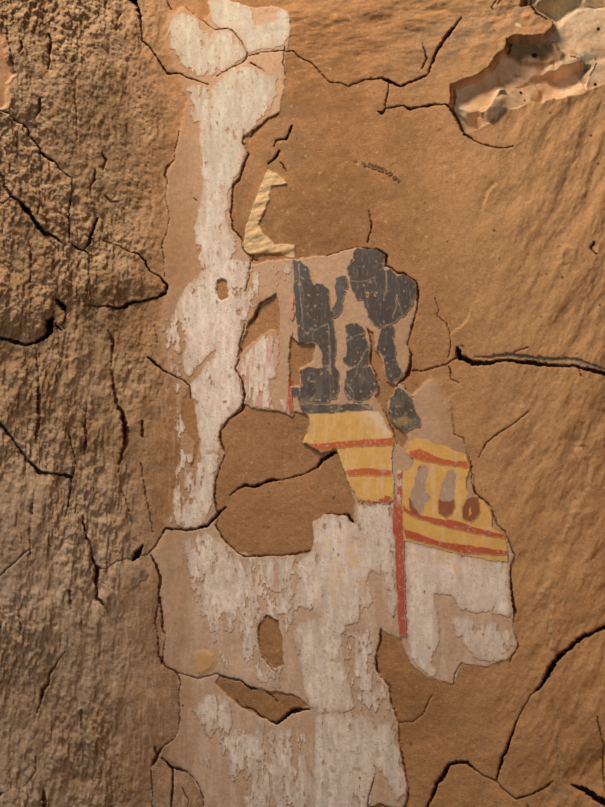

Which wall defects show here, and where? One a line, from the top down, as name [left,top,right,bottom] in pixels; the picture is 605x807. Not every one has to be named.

crack [6,28,23,74]
crack [46,32,54,70]
crack [72,76,80,140]
crack [104,0,514,149]
crack [327,211,605,398]
crack [0,98,337,807]
crack [326,513,354,523]
crack [454,413,527,663]
crack [375,628,432,807]
crack [427,625,605,807]